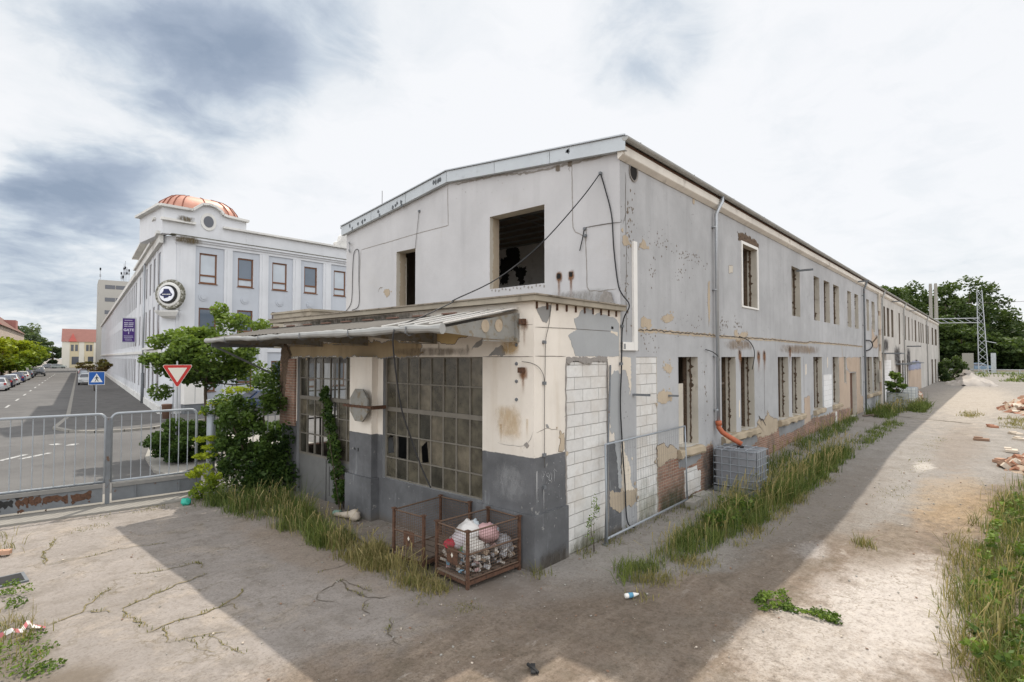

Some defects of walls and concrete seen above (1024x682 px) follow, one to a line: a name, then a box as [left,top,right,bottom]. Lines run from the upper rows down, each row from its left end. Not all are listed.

peeling [568,189,702,513]
flaking render [742,357,876,456]
corrosion [0,490,92,514]
flaking render [654,442,715,513]